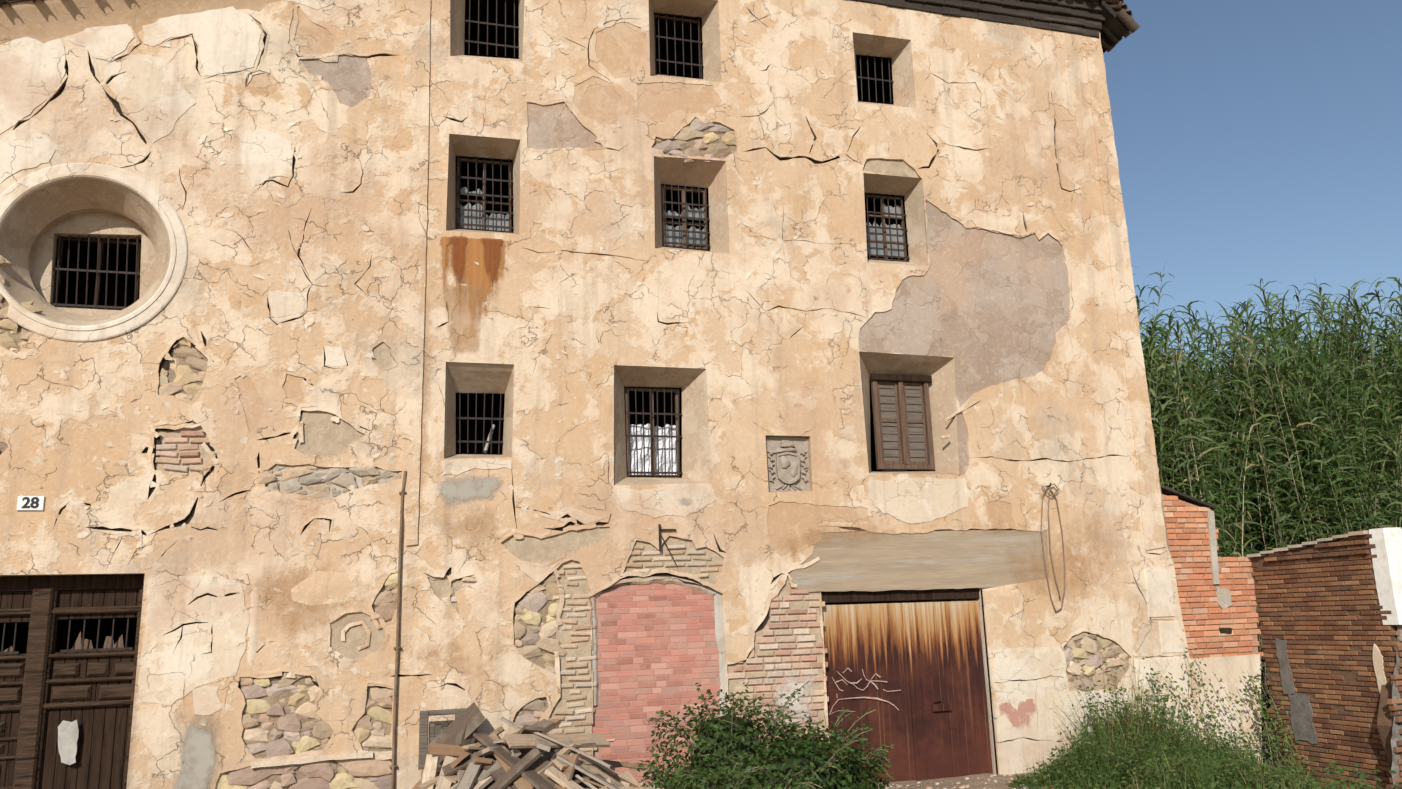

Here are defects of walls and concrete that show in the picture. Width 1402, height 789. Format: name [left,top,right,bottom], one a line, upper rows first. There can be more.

crack [11,7,399,205]
peeling [521,10,740,165]
crack [742,103,862,164]
crack [266,214,313,325]
rust [440,236,505,315]
peeling [0,428,407,789]
crack [51,330,371,556]
spalling [614,484,736,584]
peeling [725,199,1073,749]
peeling [994,628,1188,775]